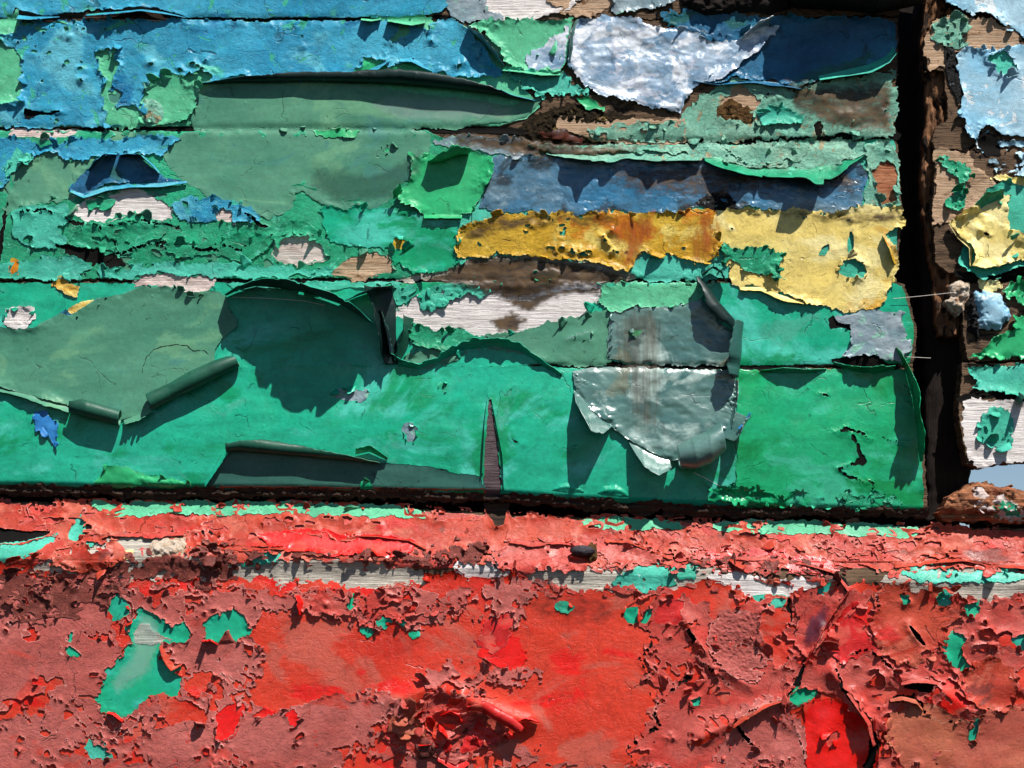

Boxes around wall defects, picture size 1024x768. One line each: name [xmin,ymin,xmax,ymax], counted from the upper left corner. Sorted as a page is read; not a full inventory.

peeling [0,0,912,476]
corrosion [614,216,651,261]
peeling [923,0,1024,469]
peeling [0,396,1024,768]
crack [838,427,897,493]